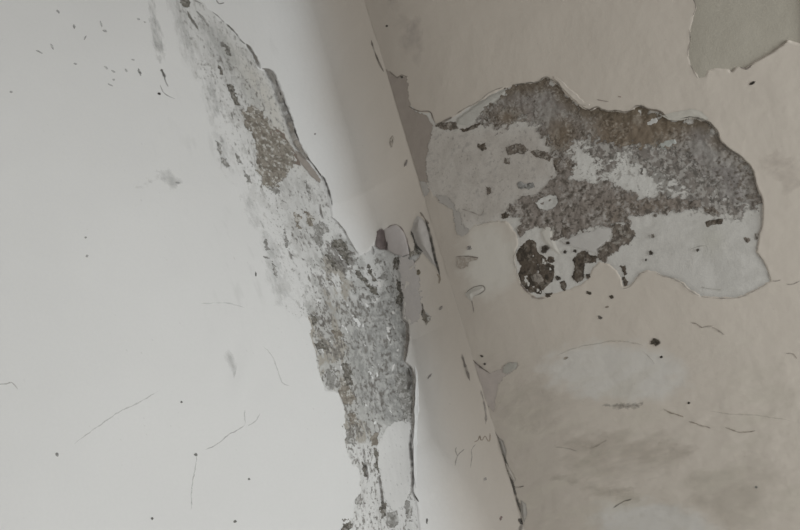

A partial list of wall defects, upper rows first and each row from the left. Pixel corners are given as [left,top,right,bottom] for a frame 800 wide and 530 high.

peeling [688,0,800,78]
spalling [175,0,441,530]
spalling [371,41,770,298]